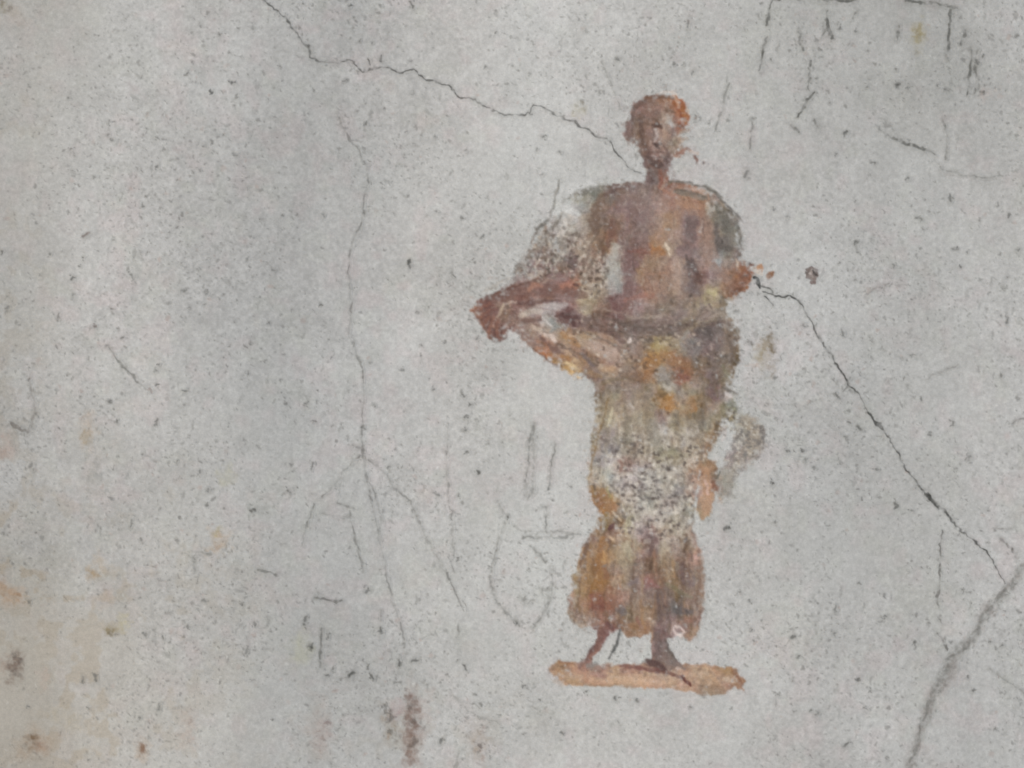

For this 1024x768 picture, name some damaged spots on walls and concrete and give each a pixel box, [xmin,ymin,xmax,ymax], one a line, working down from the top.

crack [259,0,644,176]
crack [751,273,1024,768]